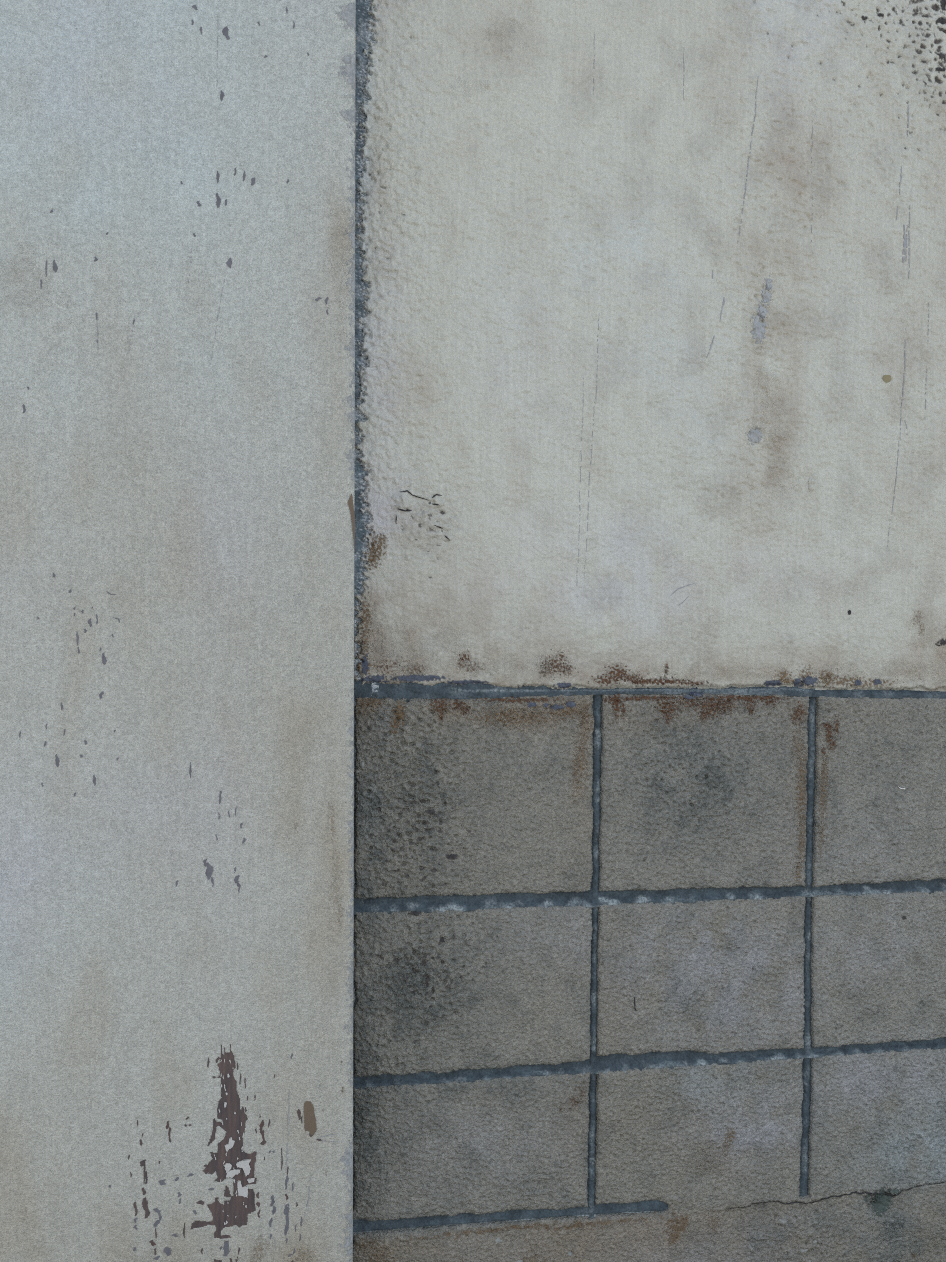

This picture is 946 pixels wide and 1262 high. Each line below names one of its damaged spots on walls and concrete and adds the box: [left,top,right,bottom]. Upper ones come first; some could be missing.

corrosion [541,649,572,673]
corrosion [426,696,585,726]
corrosion [588,664,895,725]
corrosion [796,719,839,878]
peeling [128,1044,302,1262]